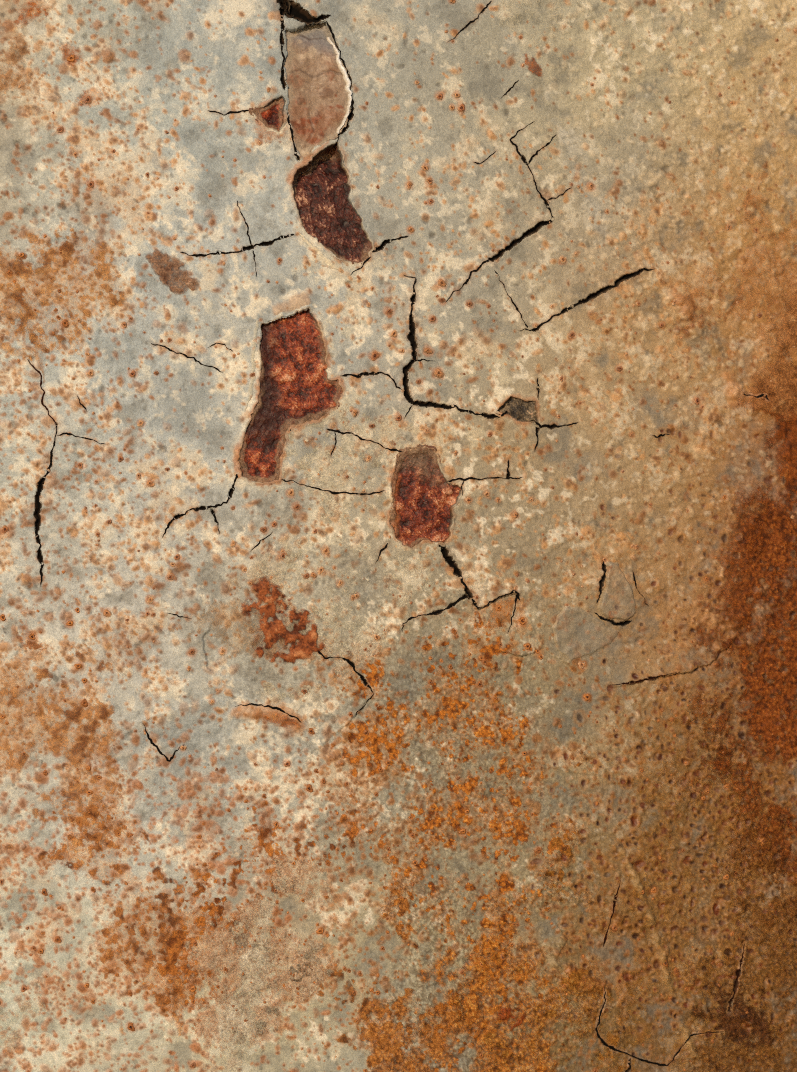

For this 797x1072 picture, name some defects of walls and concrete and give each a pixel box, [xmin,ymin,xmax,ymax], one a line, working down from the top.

rust [0,228,126,361]
crack [27,359,104,586]
rust [242,556,324,663]
peeling [235,304,346,487]
peeling [247,23,376,271]
crack [277,0,354,160]
peeling [386,444,465,551]
crack [341,275,578,450]
crack [401,542,520,634]
crack [446,121,653,332]
rust [684,191,797,1072]
rust [0,595,611,1072]